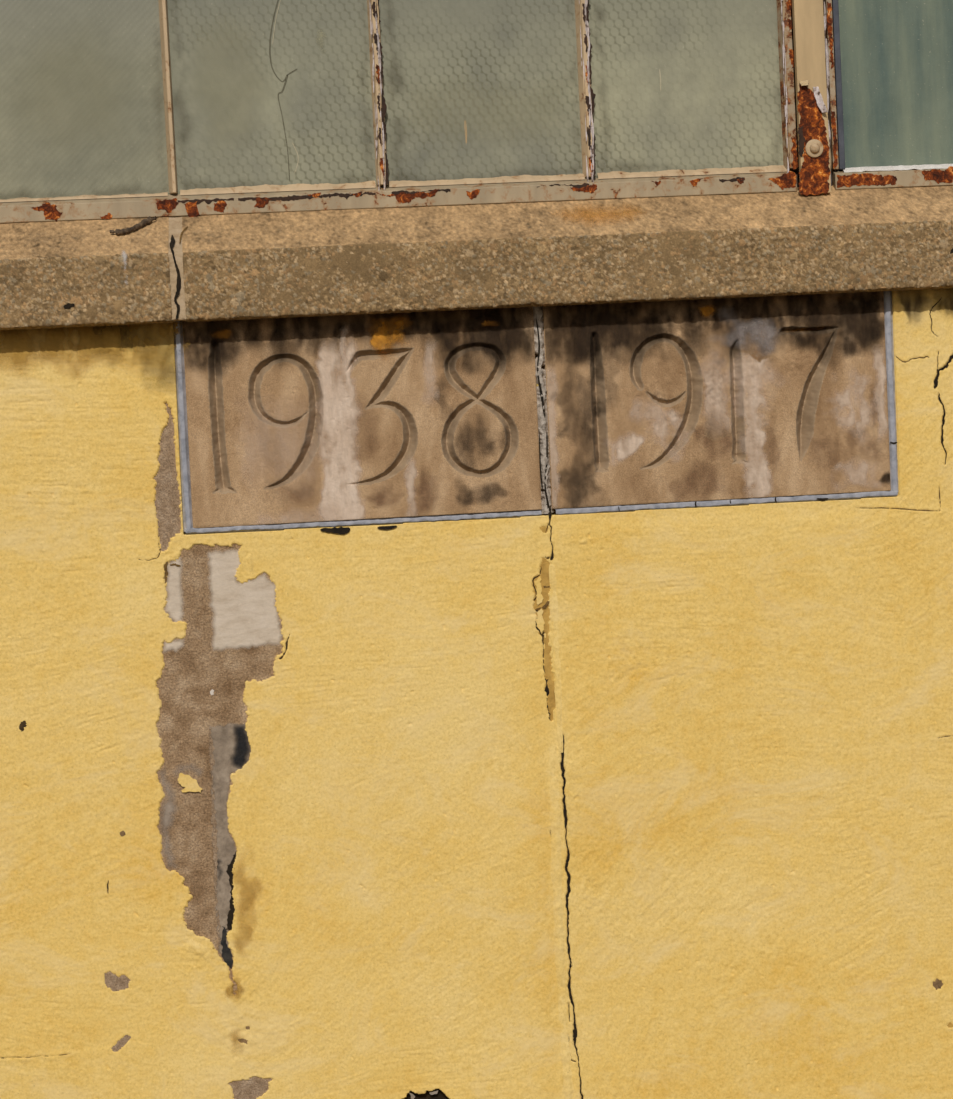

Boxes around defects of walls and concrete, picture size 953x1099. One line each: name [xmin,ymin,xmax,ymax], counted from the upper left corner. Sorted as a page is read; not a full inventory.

corrosion [156,198,200,217]
corrosion [769,85,897,196]
corrosion [922,166,953,184]
crack [170,226,188,319]
water stain [545,302,671,363]
water stain [0,308,531,521]
water stain [685,292,888,497]
crack [877,297,953,511]
flaking render [153,402,284,996]
crack [550,735,583,1099]
spalling [229,1076,272,1099]
hole [403,1089,449,1099]